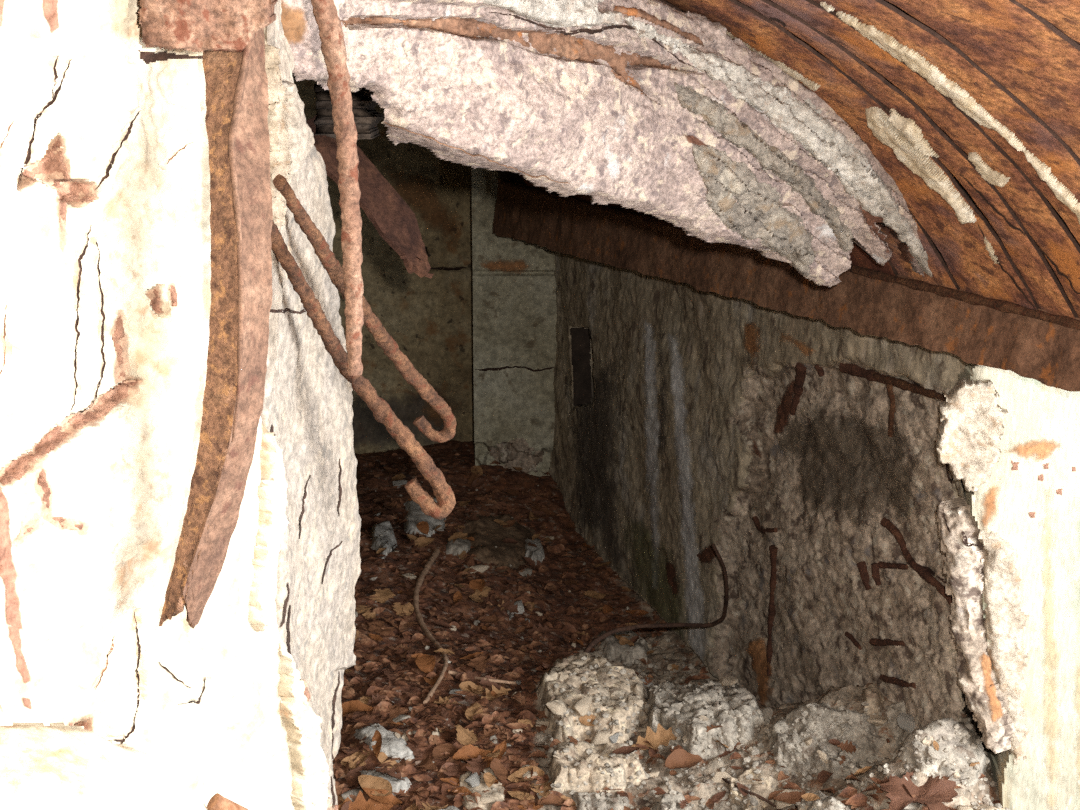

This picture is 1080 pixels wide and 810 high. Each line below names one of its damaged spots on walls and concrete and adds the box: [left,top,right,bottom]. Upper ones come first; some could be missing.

rust [139,50,203,64]
rust [281,1,306,42]
rust [613,6,704,47]
crack [0,56,72,187]
crack [96,112,139,189]
rust [860,206,913,263]
crack [0,299,8,374]
crack [67,225,106,423]
leakage [783,417,914,511]
rust [1013,441,1057,459]
spalling [709,359,1019,729]
flaking render [977,530,1030,775]